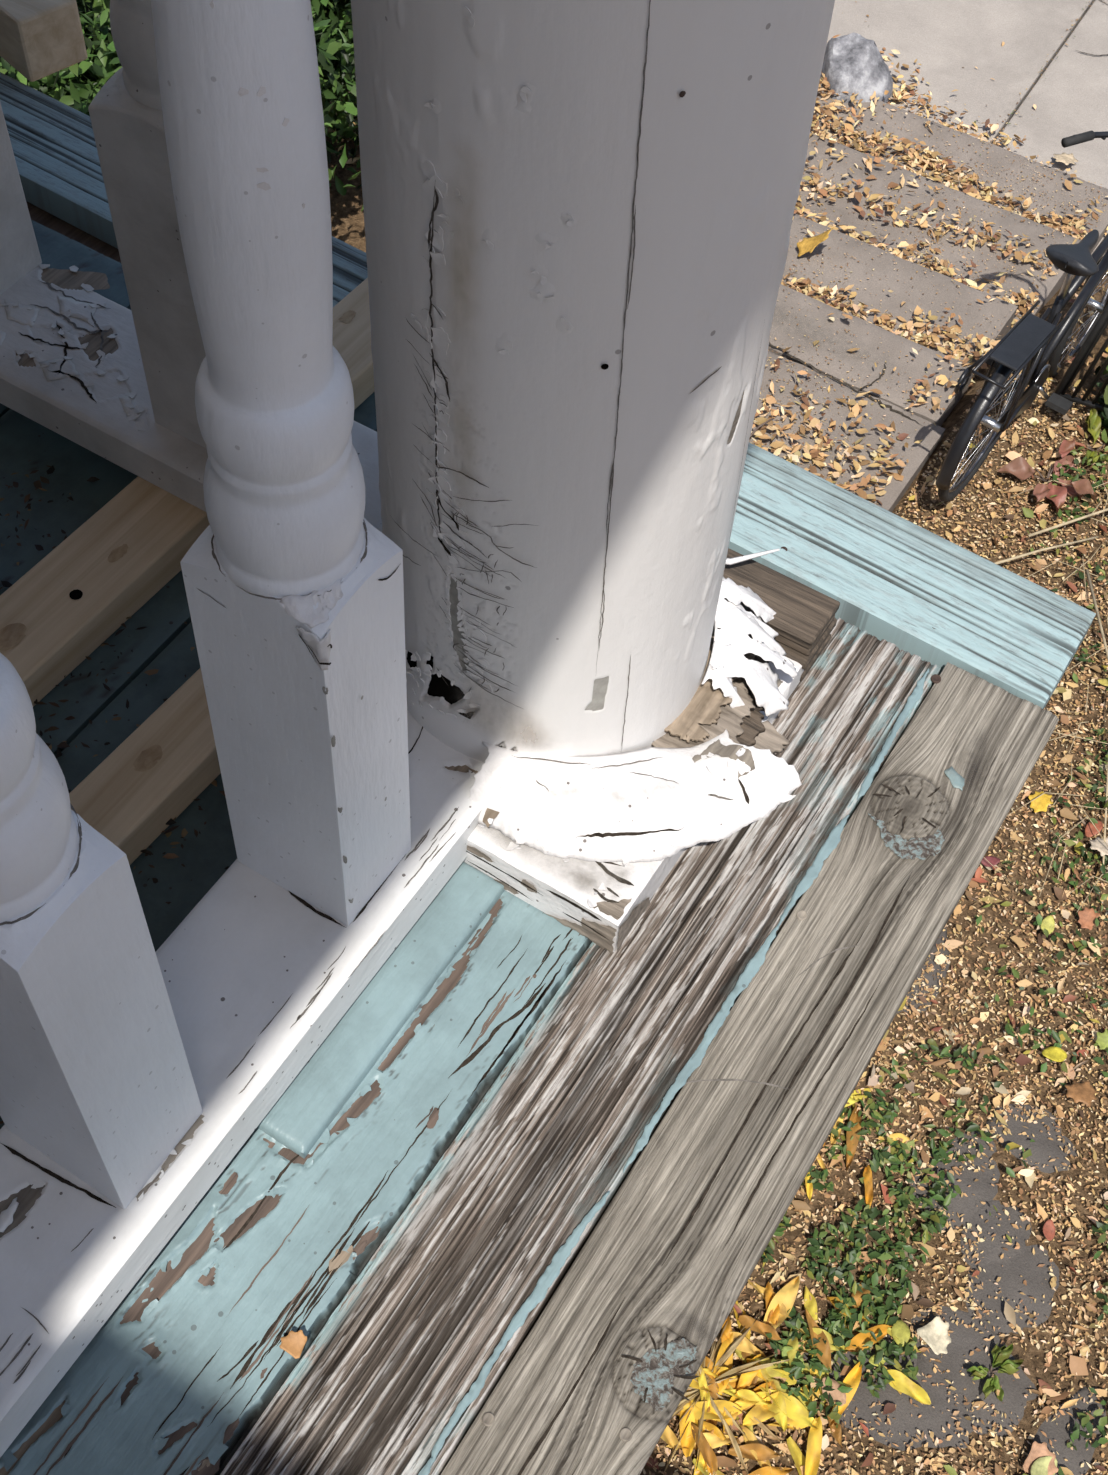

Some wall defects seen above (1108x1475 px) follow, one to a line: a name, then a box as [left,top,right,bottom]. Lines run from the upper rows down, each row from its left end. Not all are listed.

crack [19,280,111,402]
crack [378,186,537,709]
crack [514,0,733,800]
peeling [585,676,609,711]
peeling [709,577,798,717]
peeling [478,808,500,828]
peeling [263,814,569,1168]
peeling [623,669,945,1173]
peeling [0,1179,46,1238]
peeling [136,1114,209,1201]
peeling [120,1181,298,1324]
peeling [418,1191,610,1475]